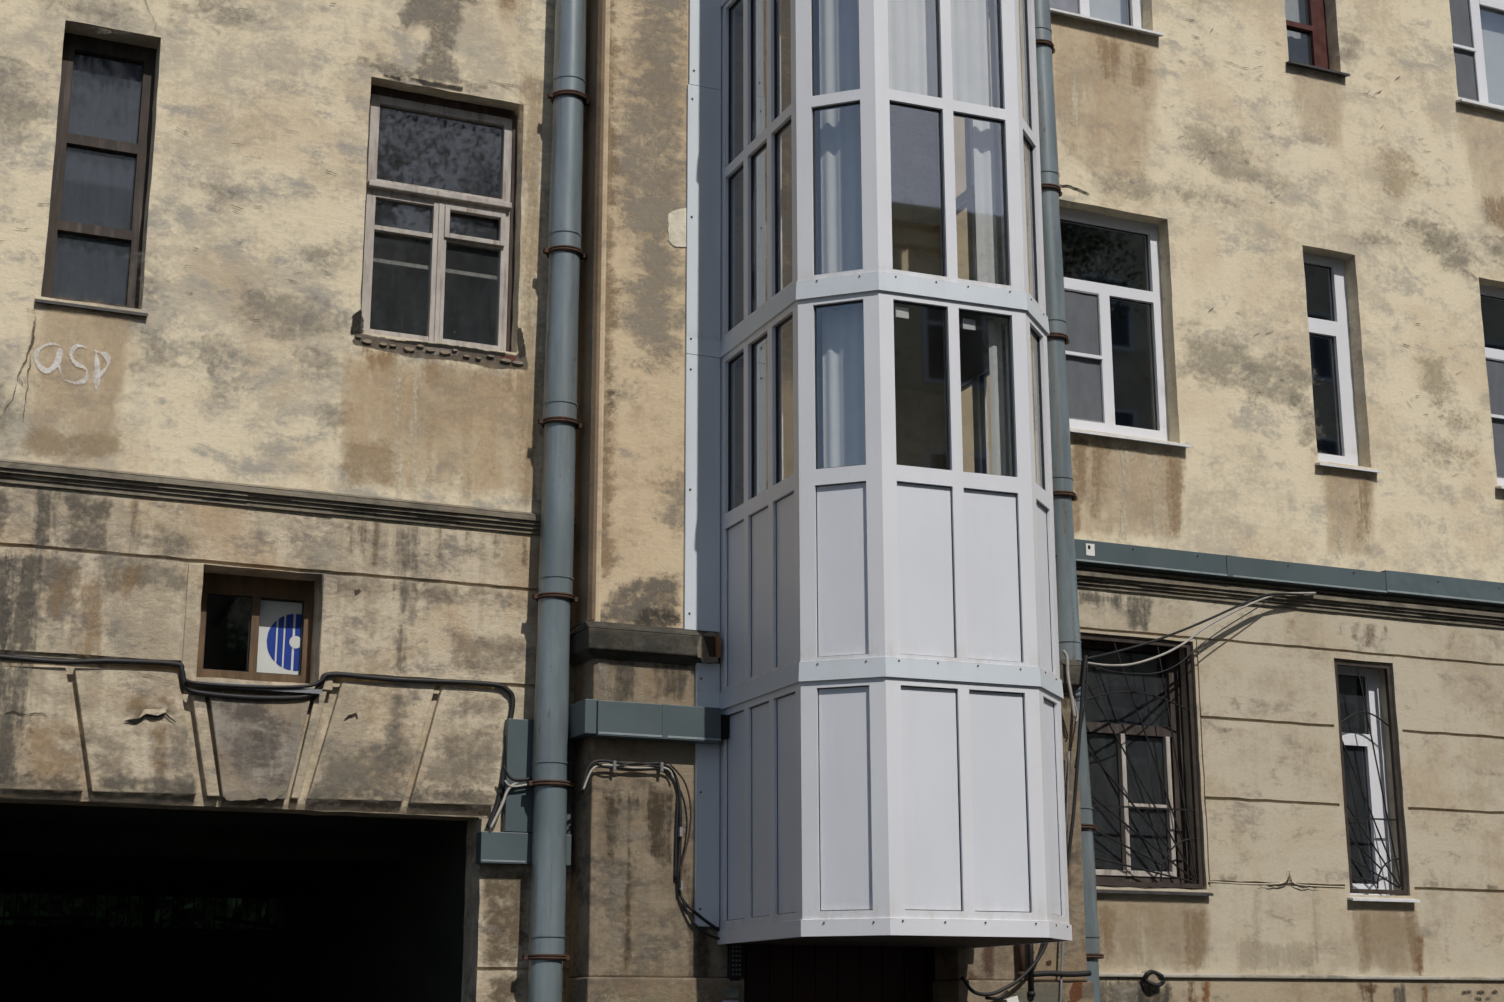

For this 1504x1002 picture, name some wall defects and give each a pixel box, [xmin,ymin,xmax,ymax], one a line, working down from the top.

damp [600,0,687,626]
damp [0,491,73,783]
flaking render [124,706,176,723]